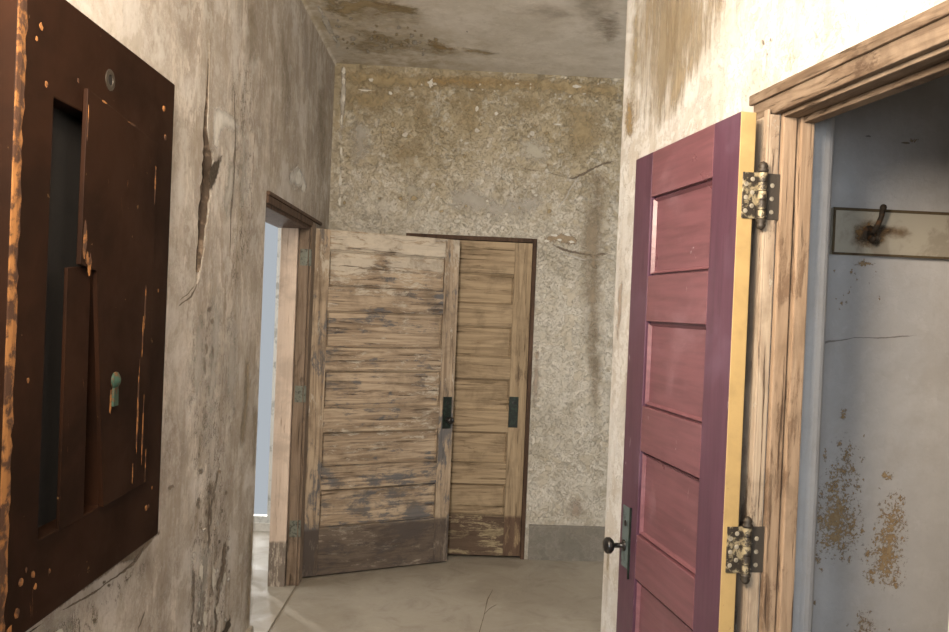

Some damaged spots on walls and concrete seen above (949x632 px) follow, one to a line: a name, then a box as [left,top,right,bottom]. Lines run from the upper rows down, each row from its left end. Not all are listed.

leakage [328,0,455,56]
leakage [633,0,713,105]
leakage [625,103,633,135]
crack [179,58,239,306]
crack [557,161,612,210]